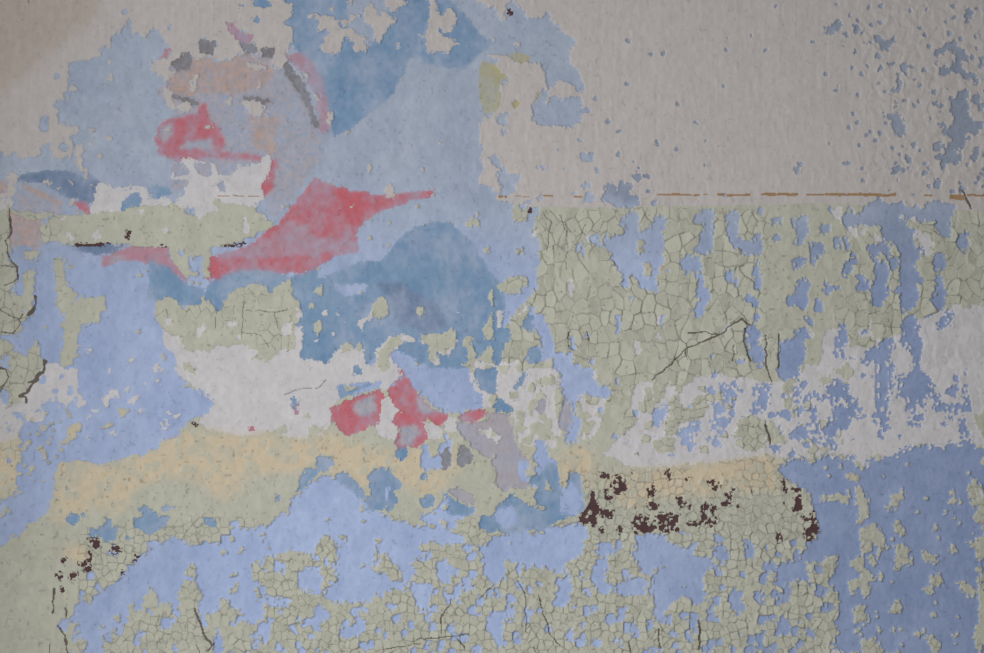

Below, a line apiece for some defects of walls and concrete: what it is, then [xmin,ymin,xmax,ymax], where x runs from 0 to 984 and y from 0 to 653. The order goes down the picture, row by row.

crack [0,208,61,408]
peeling [0,0,622,548]
peeling [572,160,670,302]
peeling [602,4,984,653]
peeling [57,470,746,653]